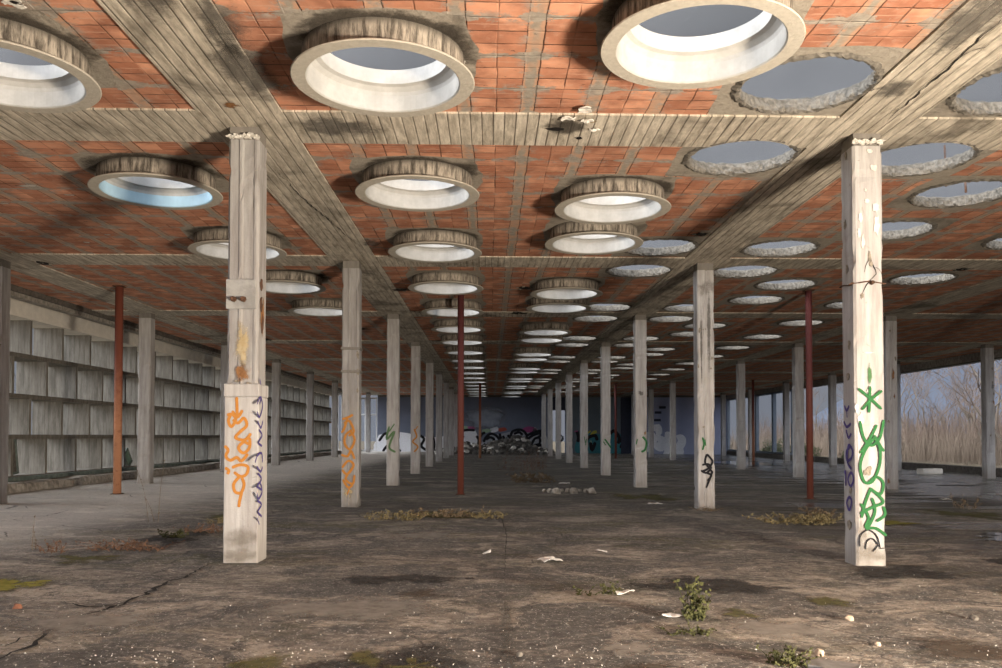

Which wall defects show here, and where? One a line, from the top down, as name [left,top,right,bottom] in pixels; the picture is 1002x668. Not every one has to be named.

damp [201,1,280,91]
damp [942,0,1002,48]
crack [72,562,215,615]
crack [0,629,53,659]